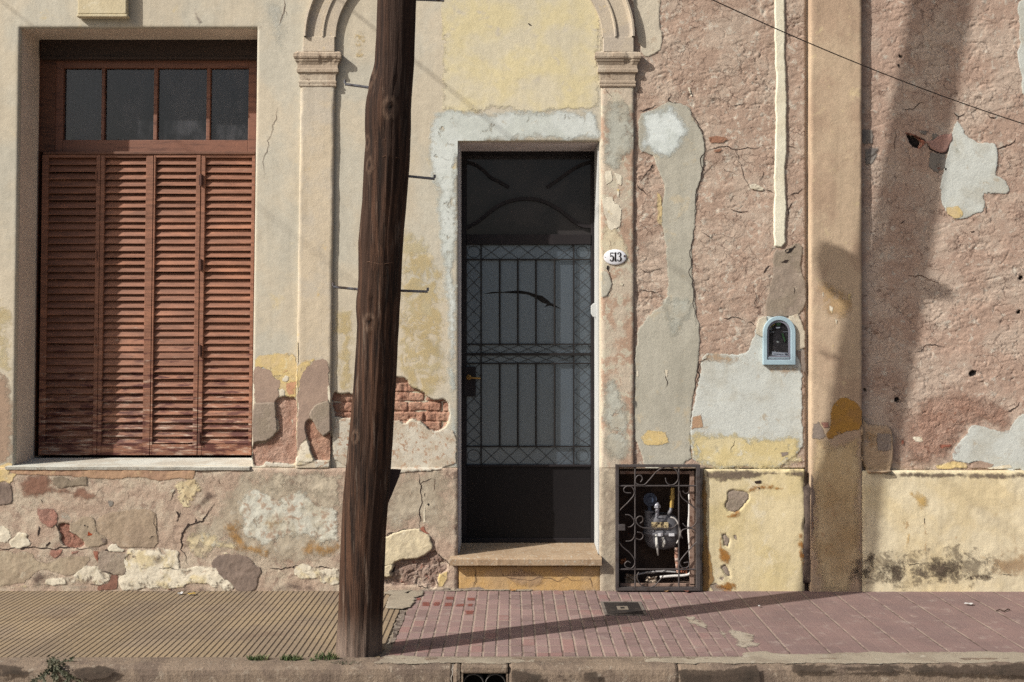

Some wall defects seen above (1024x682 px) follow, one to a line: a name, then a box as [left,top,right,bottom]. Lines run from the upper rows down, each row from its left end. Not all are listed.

peeling [430,0,635,389]
spalling [901,393,1009,462]
peeling [0,463,16,483]
peeling [0,526,30,549]
crack [149,481,220,563]
peeling [37,353,353,591]
peeling [384,377,457,588]
peeling [689,398,862,591]
water stain [854,555,905,582]
water stain [927,557,990,580]
water stain [997,556,1024,573]